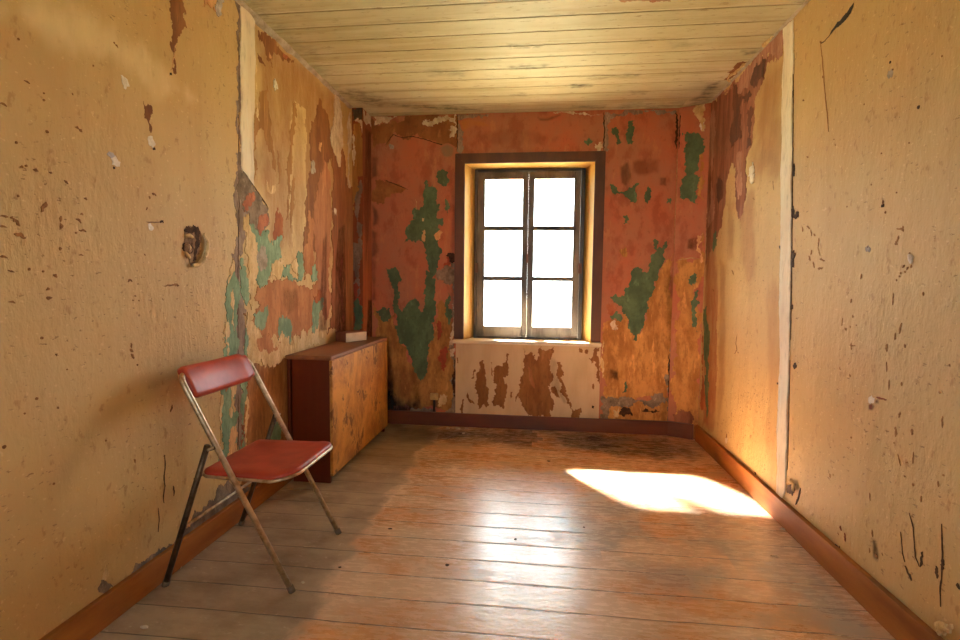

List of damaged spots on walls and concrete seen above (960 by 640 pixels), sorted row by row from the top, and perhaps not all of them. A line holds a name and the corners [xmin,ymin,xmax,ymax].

crack [820,3,854,132]
hole [182,225,210,267]
peeling [223,6,318,357]
peeling [312,297,324,334]
peeling [347,20,825,498]
peeling [218,381,249,461]
crack [893,412,960,607]